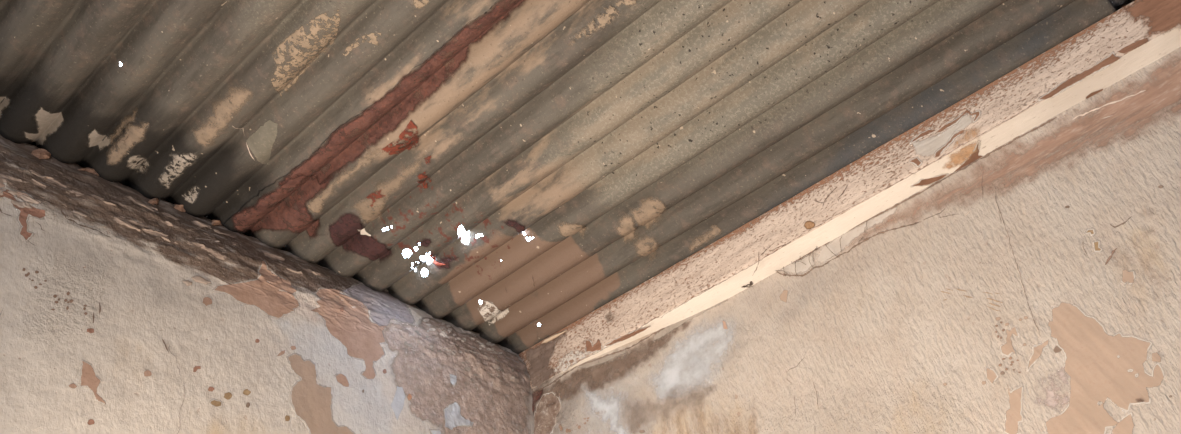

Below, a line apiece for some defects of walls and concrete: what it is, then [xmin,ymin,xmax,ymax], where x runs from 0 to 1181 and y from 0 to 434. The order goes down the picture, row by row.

peeling [271,9,381,97]
peeling [1038,0,1181,101]
peeling [25,108,63,146]
peeling [0,170,236,245]
peeling [89,111,149,172]
peeling [159,87,252,189]
rust [233,0,525,261]
peeling [780,58,1181,273]
peeling [69,360,106,404]
flaking render [182,251,589,434]
water stain [545,323,731,434]
peeling [982,302,1164,434]